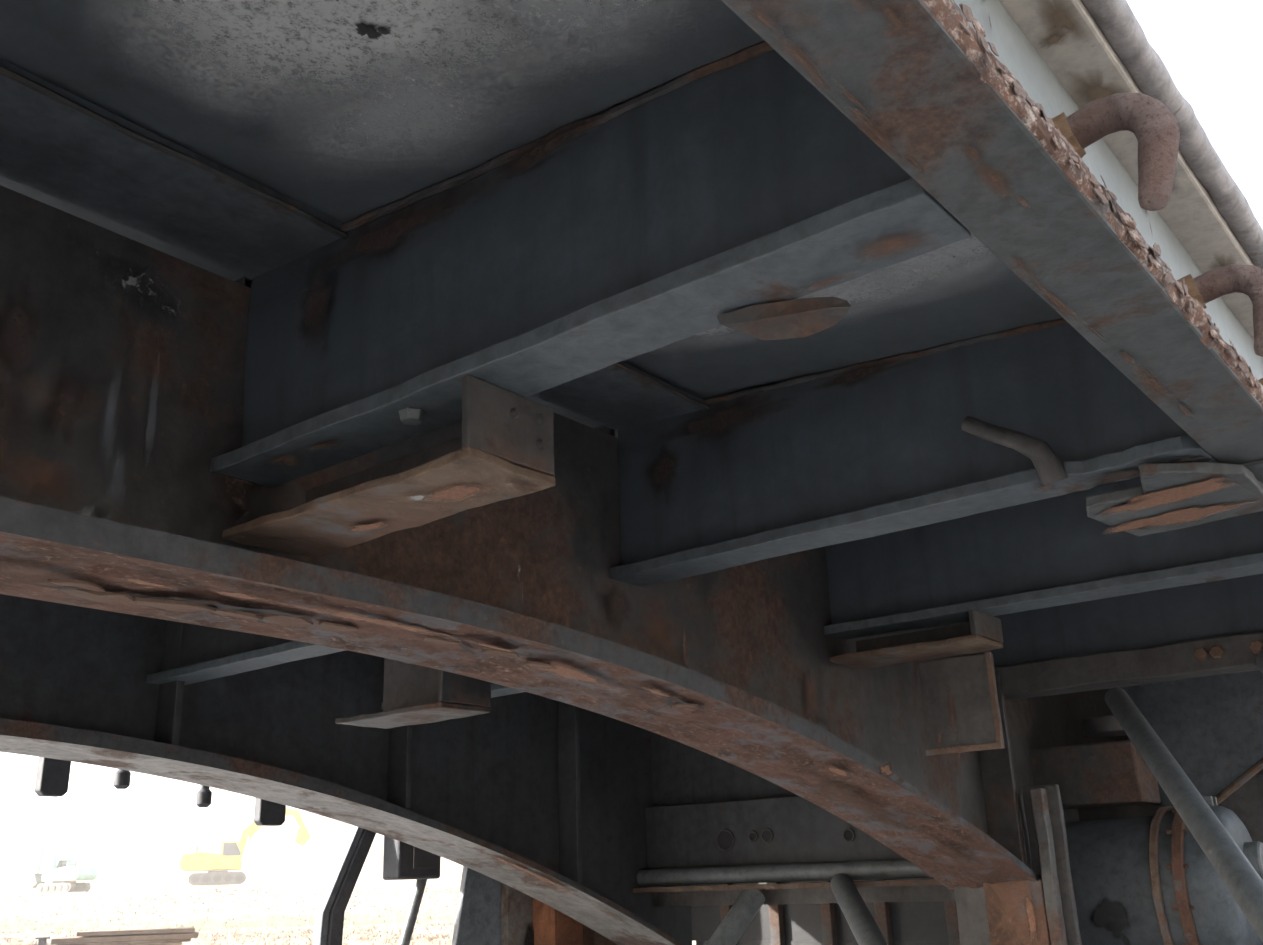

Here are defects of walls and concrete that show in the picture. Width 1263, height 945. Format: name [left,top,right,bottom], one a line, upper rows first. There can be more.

rust [923,0,1263,407]
rust [409,484,485,502]
rust [1101,477,1249,533]
rust [124,579,169,588]
rust [215,591,451,637]
crack [415,632,551,668]
rust [528,664,614,689]
crack [625,684,709,711]